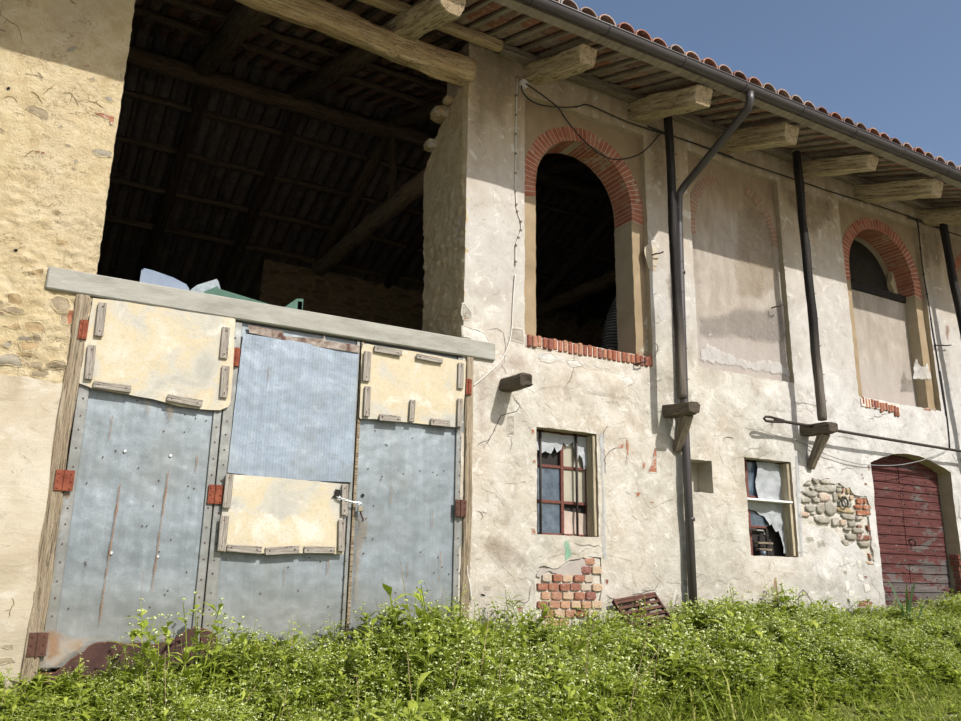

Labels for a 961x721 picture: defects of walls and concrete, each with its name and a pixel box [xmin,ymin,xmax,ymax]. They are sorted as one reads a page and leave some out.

crack [0,73,104,131]
water stain [701,311,789,376]
crack [479,396,520,450]
flaking render [798,465,884,610]
flaking render [535,556,609,626]
rust [36,628,221,693]